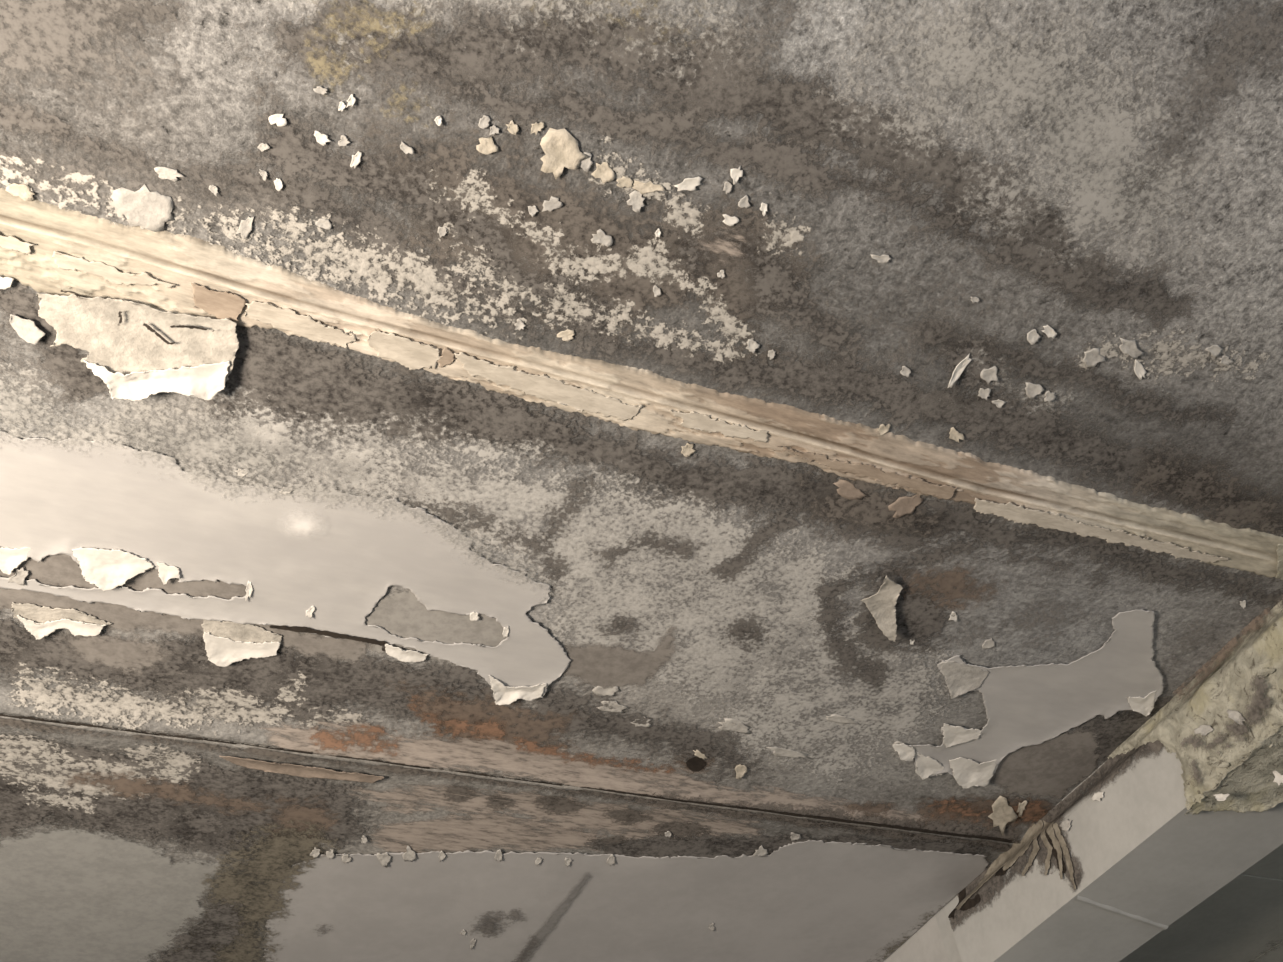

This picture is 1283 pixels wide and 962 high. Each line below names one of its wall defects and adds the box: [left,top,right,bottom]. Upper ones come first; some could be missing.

peeling [111,166,185,232]
peeling [476,115,703,213]
leakage [0,0,1283,537]
peeling [0,251,676,727]
leakage [0,284,1283,787]
peeling [973,498,1229,563]
peeling [861,575,914,645]
rust [403,682,573,749]
peeling [219,595,1283,962]
leakage [1047,696,1171,831]
leakage [0,733,383,962]
leakage [585,833,991,861]